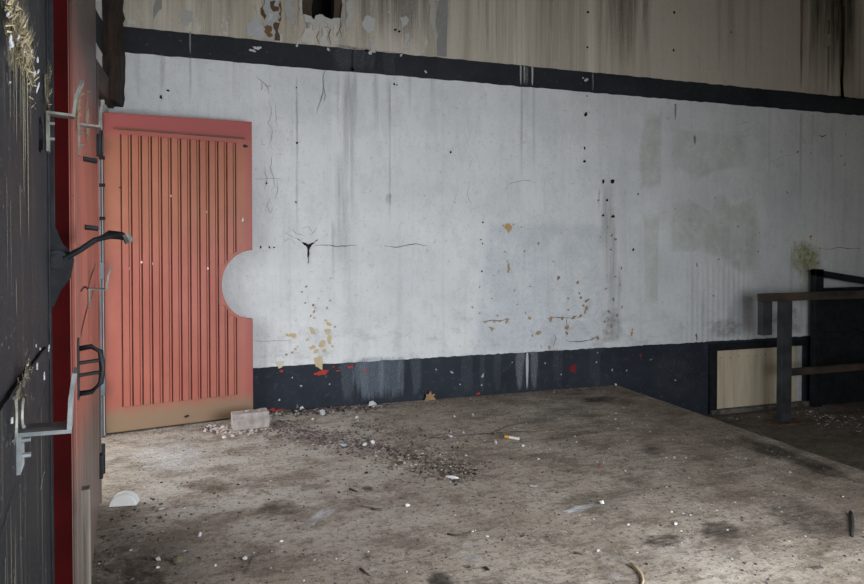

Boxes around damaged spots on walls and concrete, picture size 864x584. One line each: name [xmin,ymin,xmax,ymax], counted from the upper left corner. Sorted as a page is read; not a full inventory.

peeling [246,0,282,52]
flaking render [296,0,385,55]
peeling [428,0,448,57]
crack [284,226,350,263]